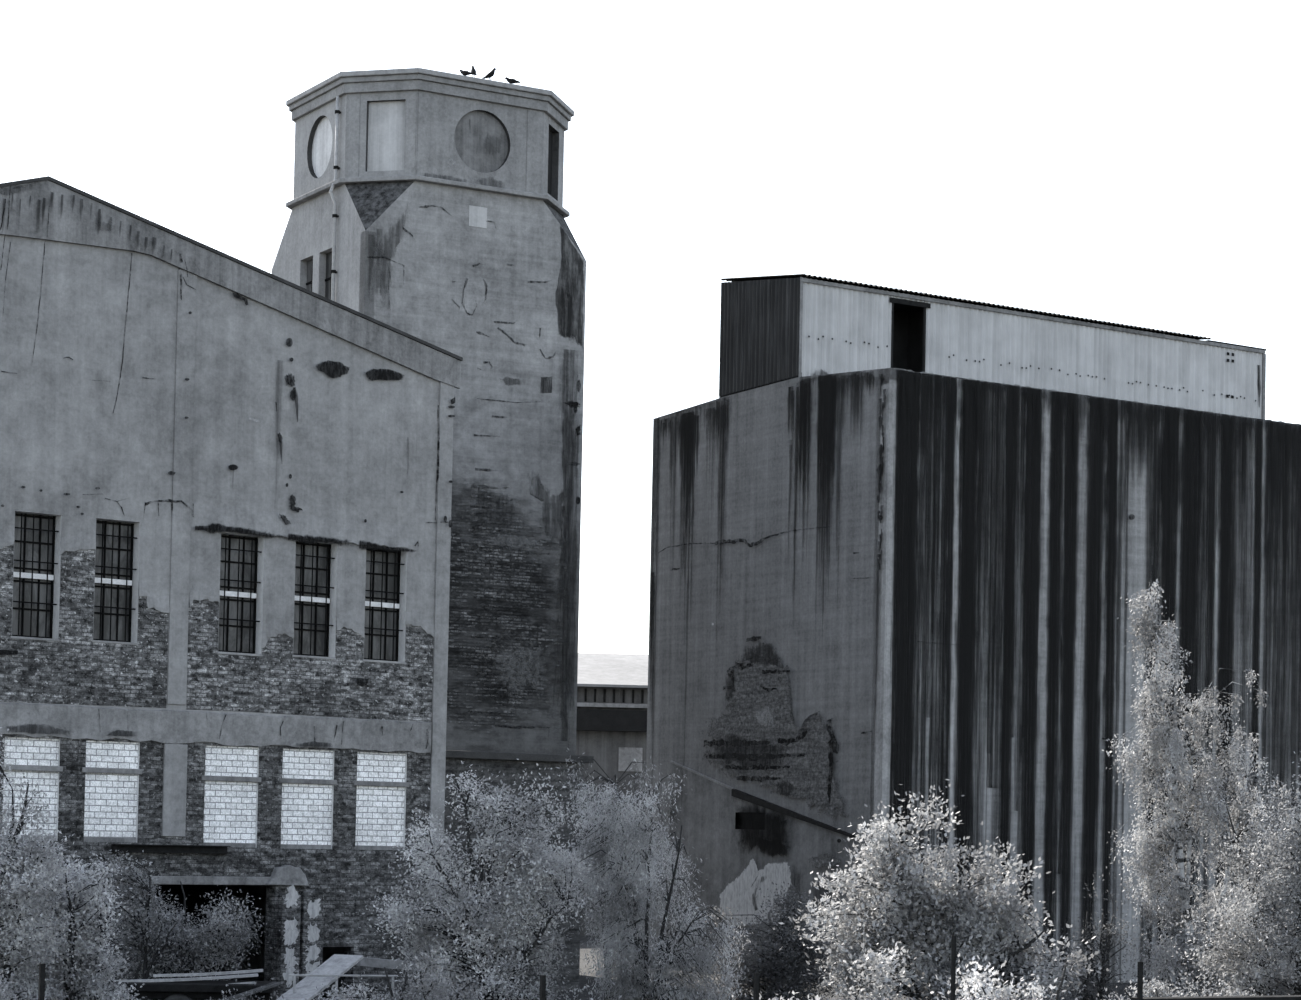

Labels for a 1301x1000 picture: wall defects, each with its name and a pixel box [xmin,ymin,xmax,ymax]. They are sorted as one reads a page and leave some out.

water stain [3,192,172,258]
water stain [556,227,584,346]
flaking render [316,360,349,378]
flaking render [366,369,404,381]
water stain [661,413,699,530]
flaking render [0,527,170,708]
flaking render [186,474,563,732]
crack [660,526,832,570]
spalling [702,636,852,820]
water stain [788,369,1301,983]
peeling [720,859,792,931]